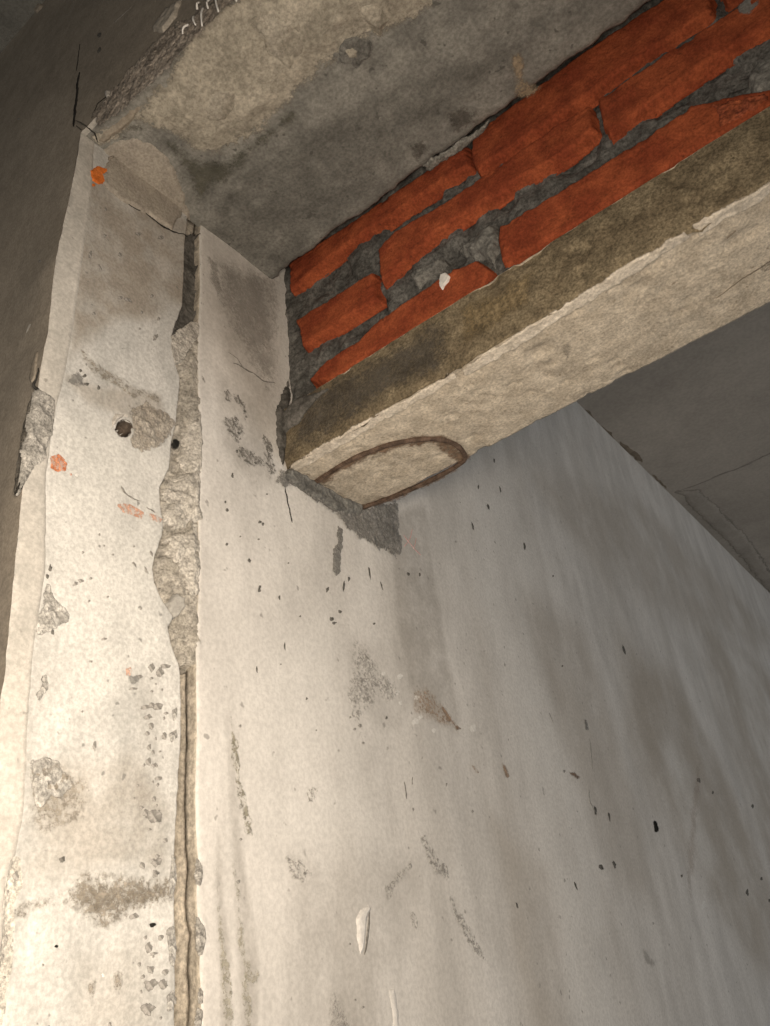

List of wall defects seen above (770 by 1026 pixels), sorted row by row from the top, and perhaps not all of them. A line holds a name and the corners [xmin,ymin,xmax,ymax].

crack [73,45,119,143]
spalling [92,0,233,142]
spalling [422,120,489,171]
spalling [291,182,770,471]
spalling [14,351,55,496]
crack [584,409,770,491]
spalling [129,233,204,831]
spalling [0,857,23,1026]
spalling [129,854,177,919]
spalling [138,923,177,1019]